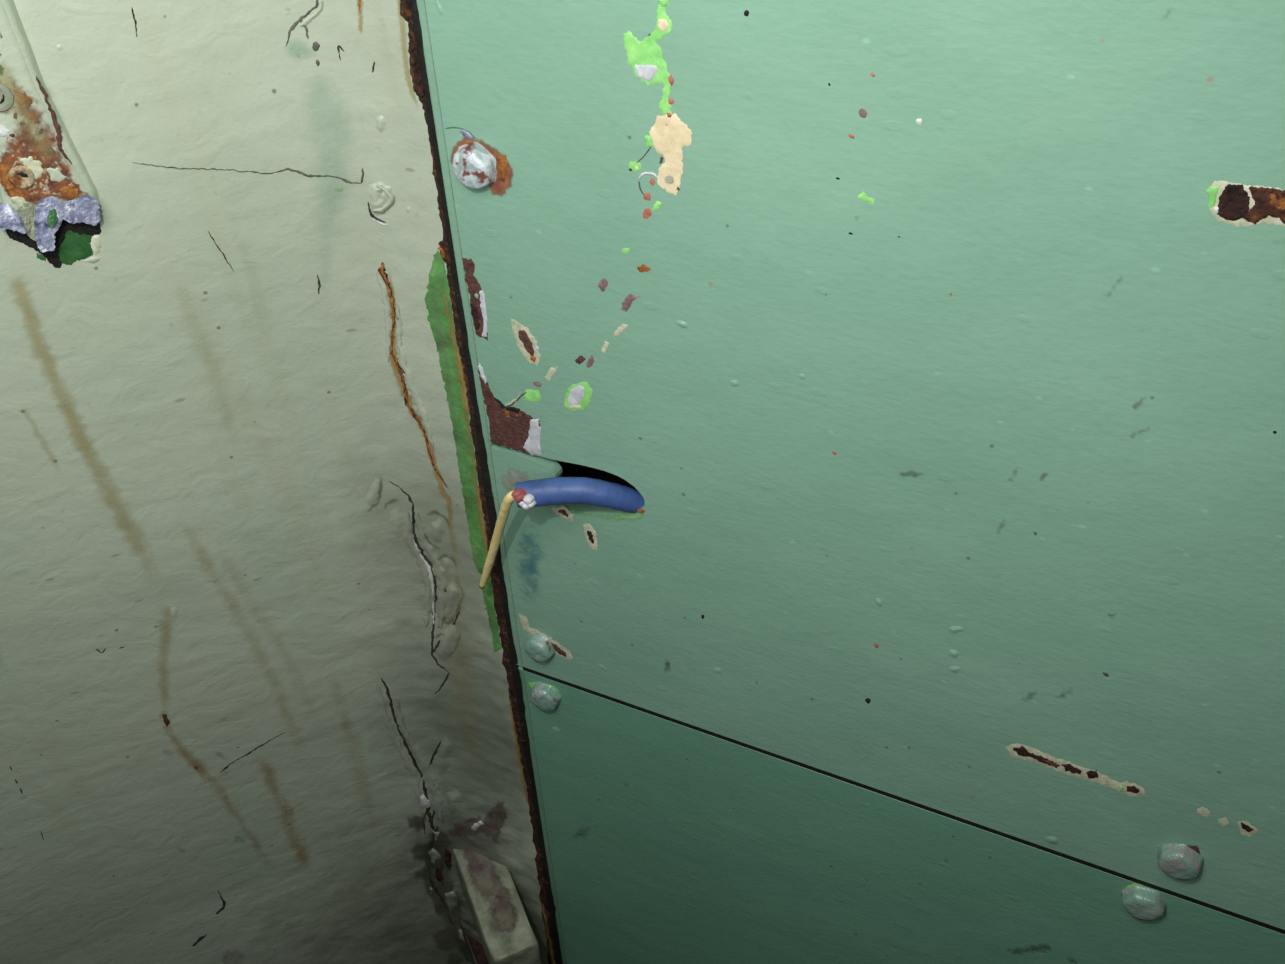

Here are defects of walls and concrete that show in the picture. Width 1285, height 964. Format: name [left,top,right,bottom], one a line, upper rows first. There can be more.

rust [0,76,87,205]
peeling [5,219,102,268]
crack [132,162,364,191]
peeling [623,0,692,219]
peeling [564,294,640,411]
crack [376,262,460,694]
peeling [425,251,502,652]
rust [398,0,573,964]
crack [376,678,444,835]
rust [1005,743,1145,797]